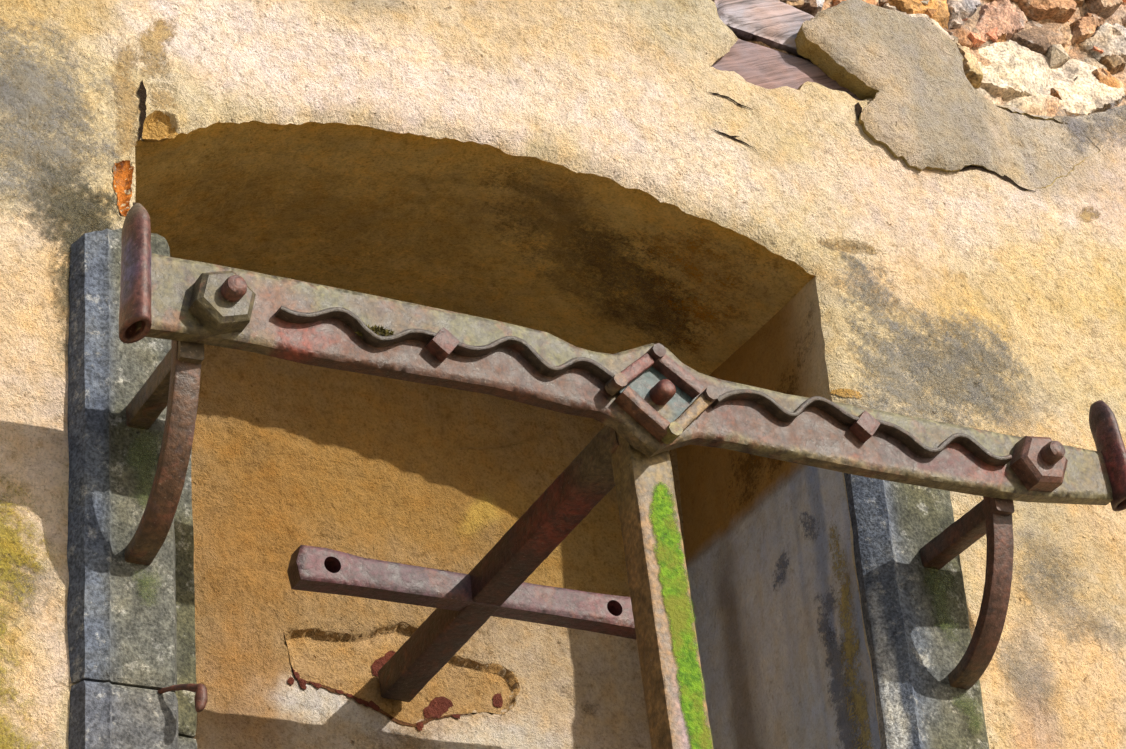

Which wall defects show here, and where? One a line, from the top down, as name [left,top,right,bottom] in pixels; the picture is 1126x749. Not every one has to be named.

crack [137,80,147,141]
crack [708,92,753,110]
crack [713,129,758,152]
crack [959,165,1036,192]
spalling [284,622,520,731]